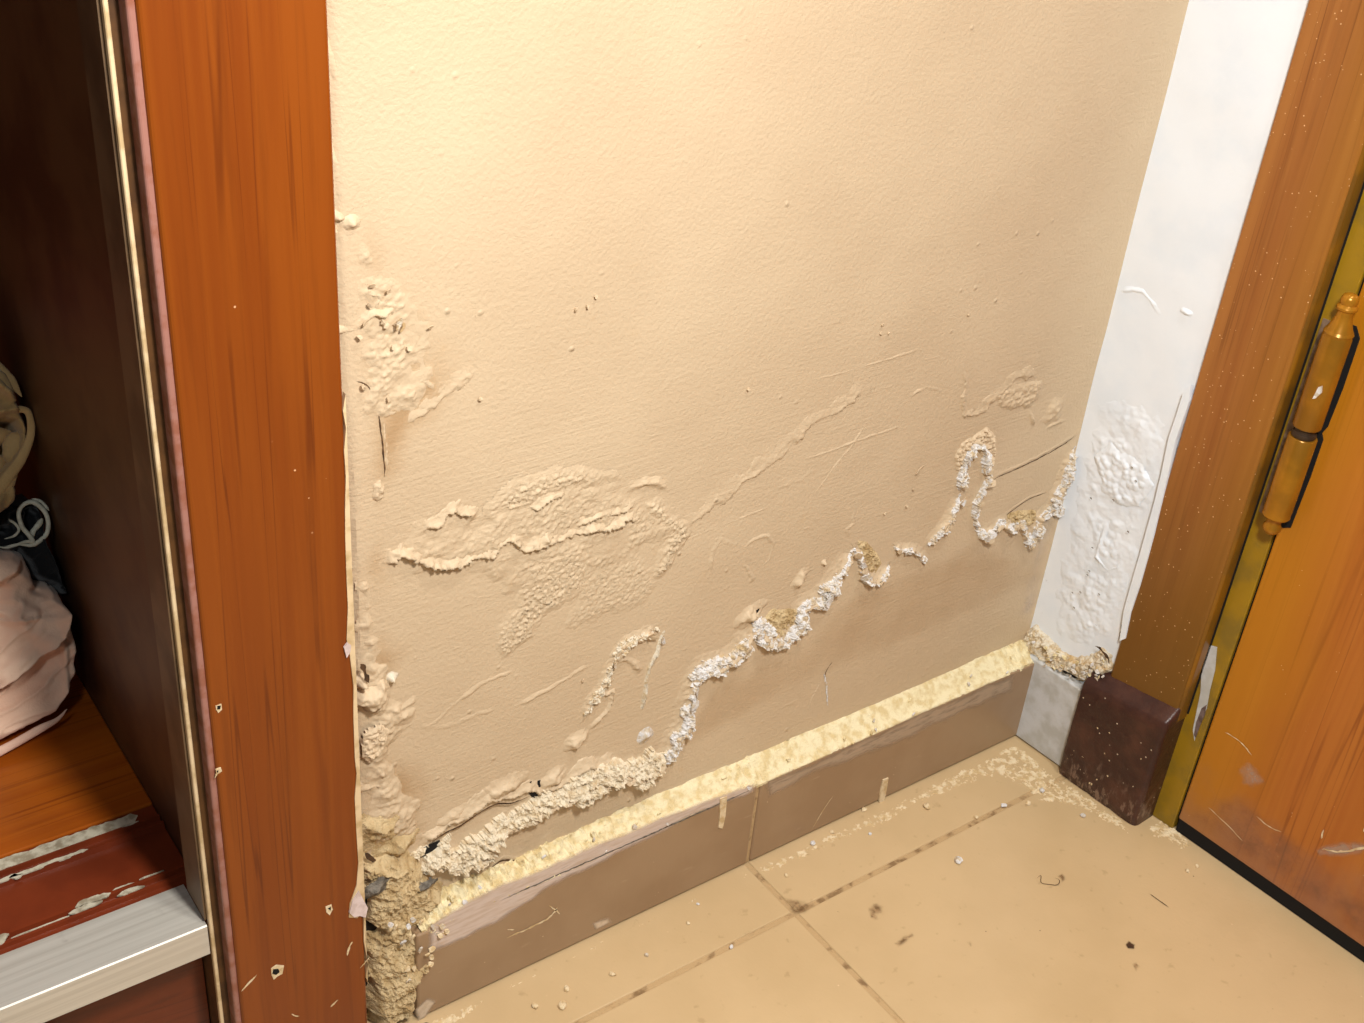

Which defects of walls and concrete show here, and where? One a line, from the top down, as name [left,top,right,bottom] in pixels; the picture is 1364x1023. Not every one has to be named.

peeling [345,242,488,432]
spalling [354,427,1114,1023]